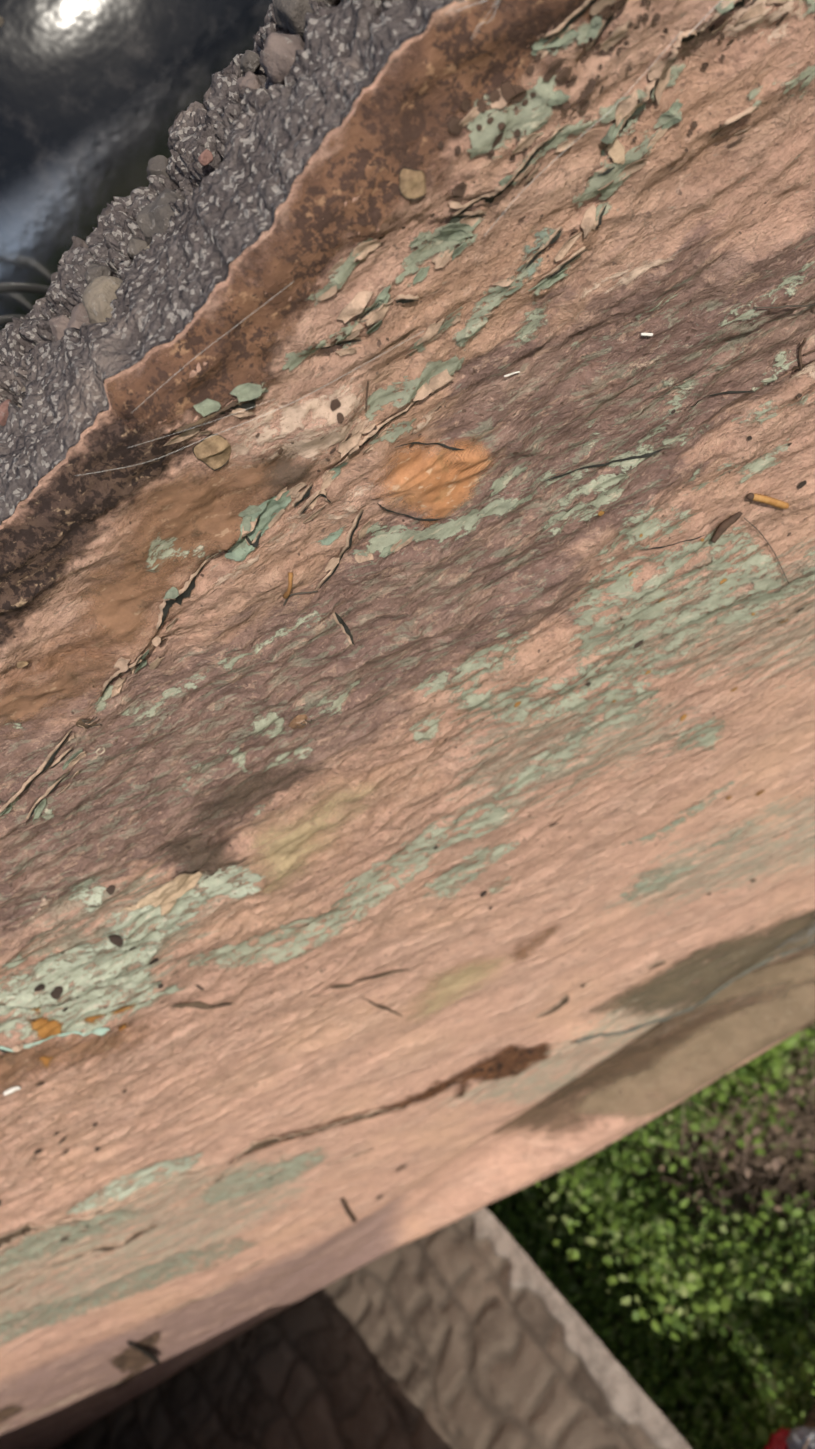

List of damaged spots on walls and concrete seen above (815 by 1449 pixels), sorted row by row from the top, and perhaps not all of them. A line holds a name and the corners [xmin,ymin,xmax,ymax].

peeling [531,22,591,59]
damp [702,25,734,69]
peeling [459,58,686,222]
spalling [0,0,486,525]
damp [0,0,668,645]
peeling [365,227,587,444]
corrosion [384,444,490,517]
peeling [0,350,815,1040]
damp [162,766,307,880]
damp [263,804,335,890]
corrosion [231,1043,550,1163]
damp [495,911,815,1133]